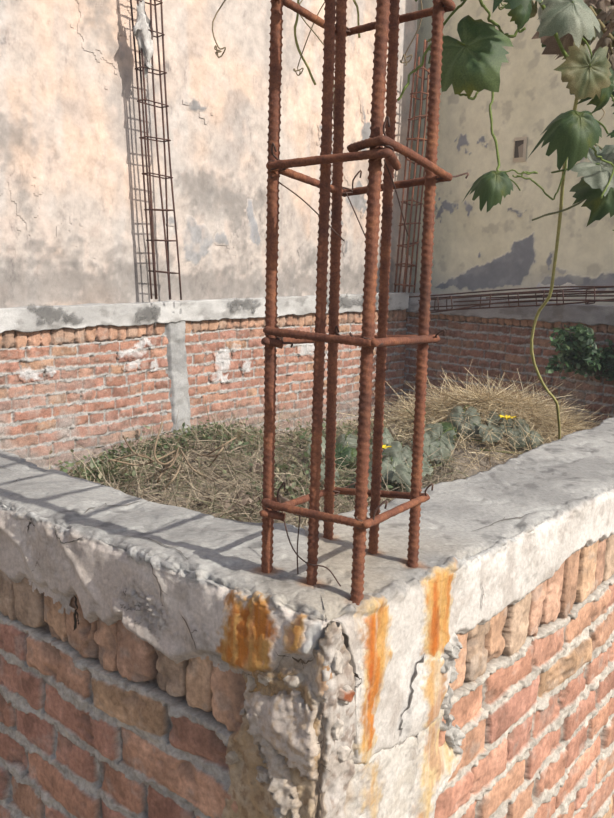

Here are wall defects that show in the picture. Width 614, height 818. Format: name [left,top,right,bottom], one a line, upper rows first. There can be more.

spalling [306,0,614,605]
crack [72,594,80,631]
crack [117,536,188,560]
rust [214,585,333,702]
spalling [222,619,360,818]
rust [338,594,395,818]
crack [390,653,425,751]
rust [405,557,463,818]